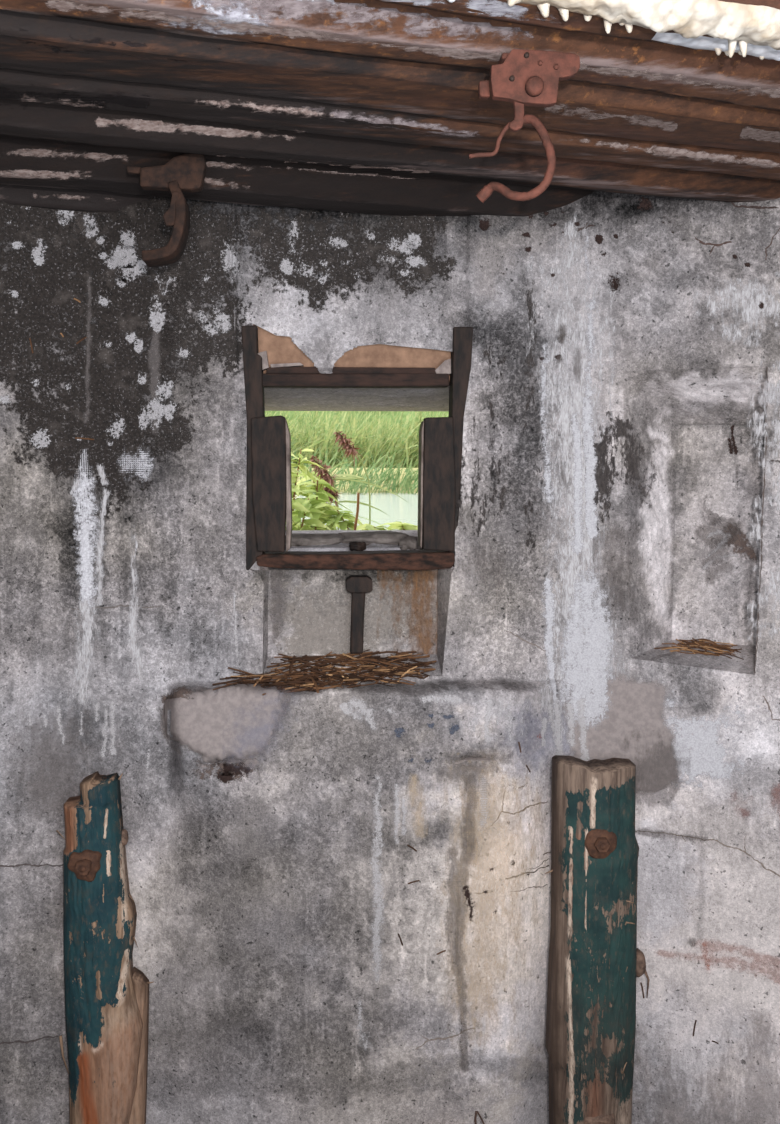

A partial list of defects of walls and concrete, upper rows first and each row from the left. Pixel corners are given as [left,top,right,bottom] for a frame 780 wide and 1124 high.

leakage [46,0,780,61]
leakage [0,87,304,140]
leakage [200,101,478,137]
leakage [545,104,678,132]
leakage [0,149,127,180]
leakage [204,155,250,188]
leakage [581,139,780,168]
leakage [0,194,461,757]
leakage [455,218,657,761]
crack [635,830,780,877]
leakage [370,777,407,981]
leakage [461,886,475,920]